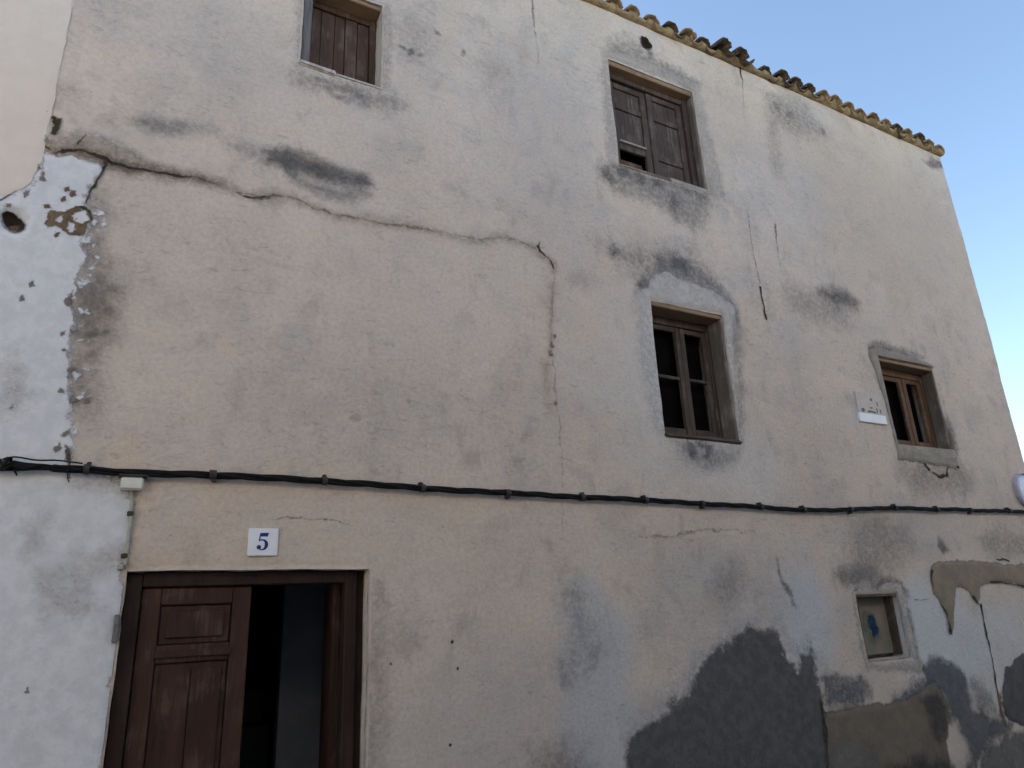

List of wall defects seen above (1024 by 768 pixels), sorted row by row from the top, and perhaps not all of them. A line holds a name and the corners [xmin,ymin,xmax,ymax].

crack [45,135,201,203]
crack [239,193,299,201]
leakage [268,149,371,197]
crack [748,215,778,320]
peeling [0,115,134,768]